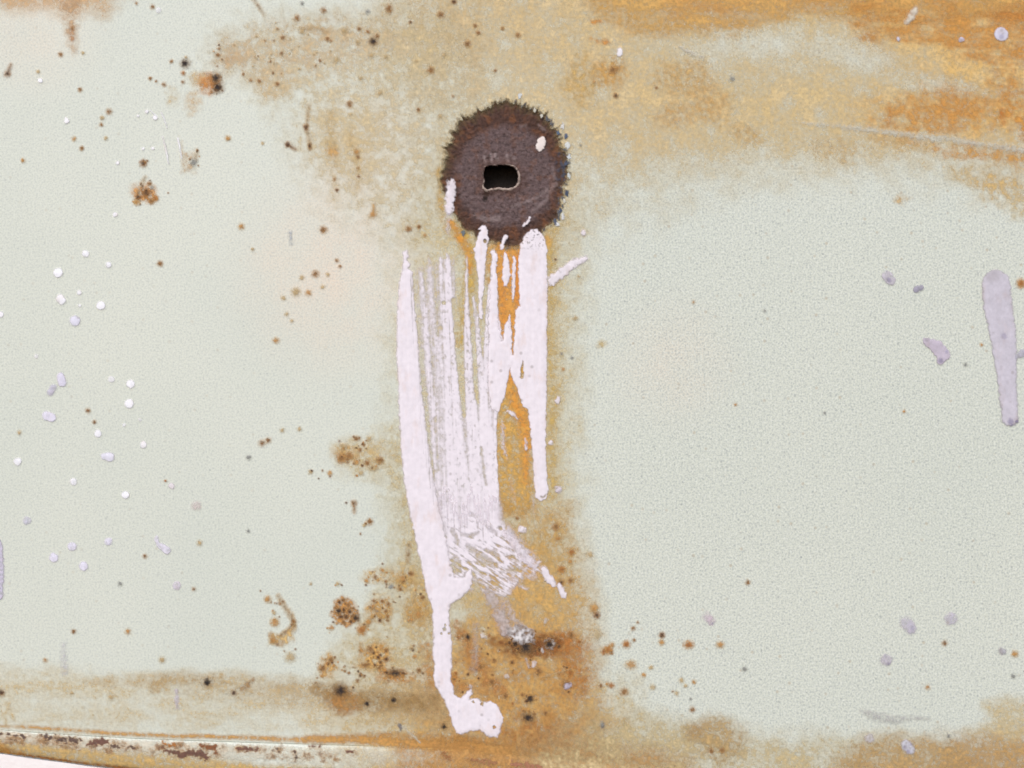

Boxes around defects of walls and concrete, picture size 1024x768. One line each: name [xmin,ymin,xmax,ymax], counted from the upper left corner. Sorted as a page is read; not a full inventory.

rust [132,180,169,205]
peeling [439,93,571,248]
rust [170,0,1024,218]
rust [0,220,676,768]
rust [841,705,1024,768]